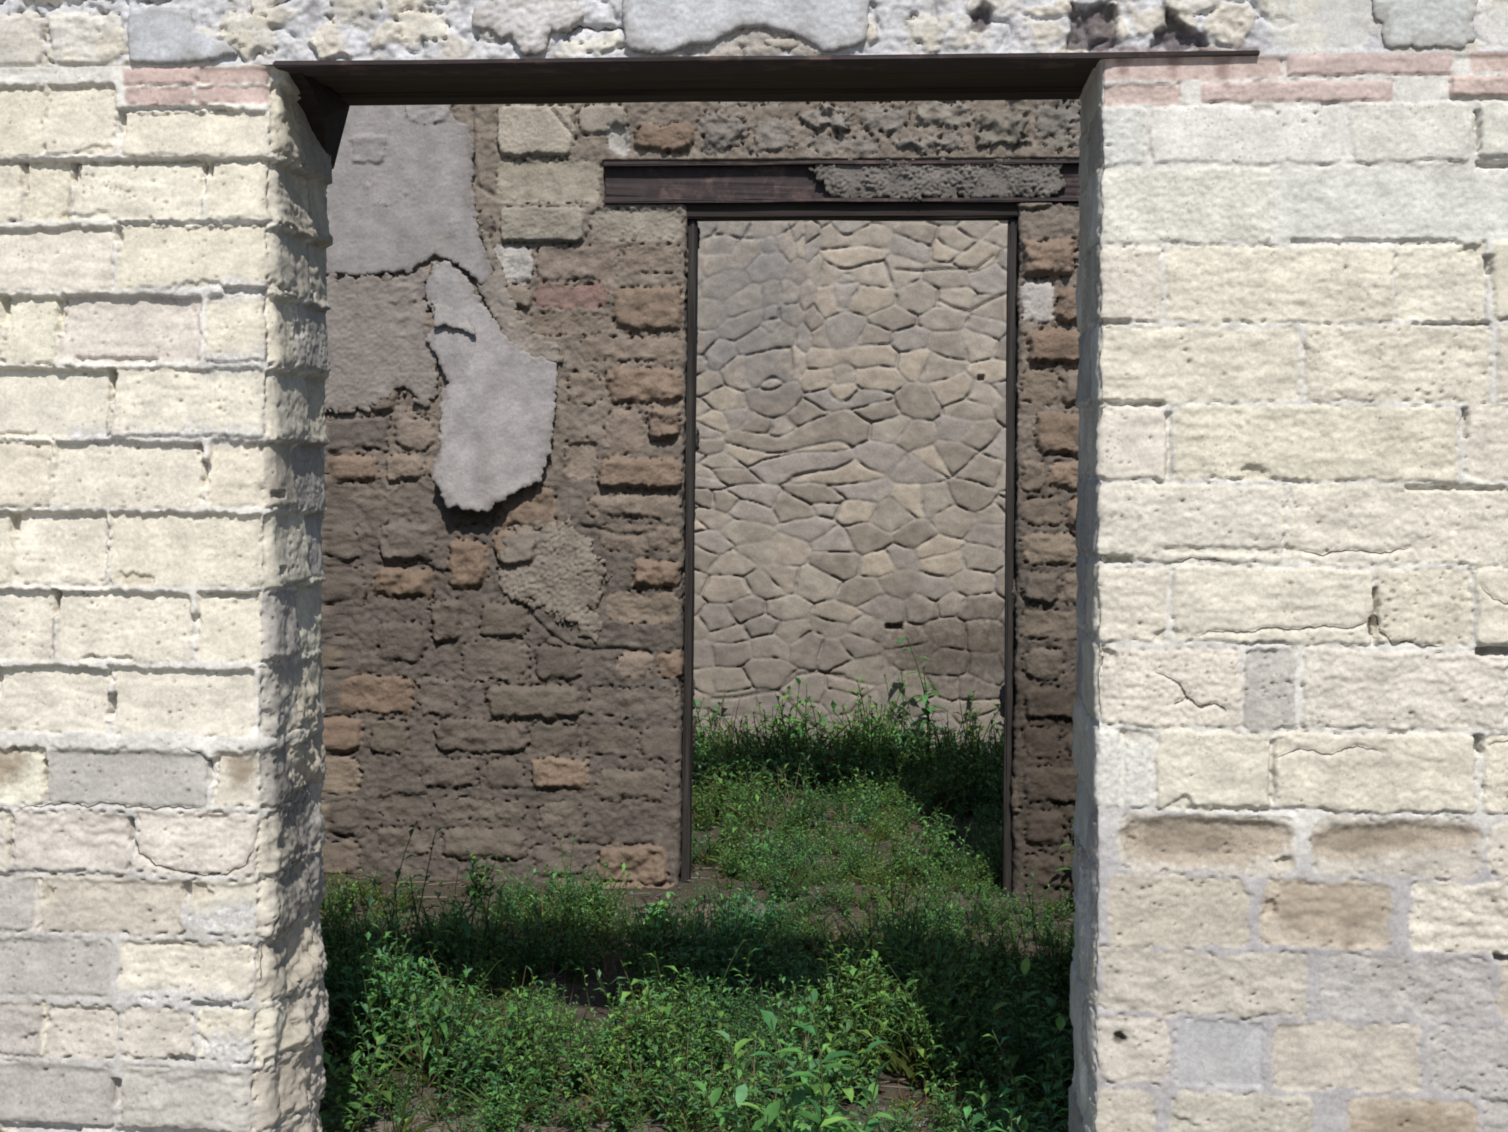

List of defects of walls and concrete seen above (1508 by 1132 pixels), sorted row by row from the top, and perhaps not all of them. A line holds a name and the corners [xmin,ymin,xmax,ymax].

flaking render [324,105,564,512]
crack [1157,672,1226,711]
crack [15,801,254,876]